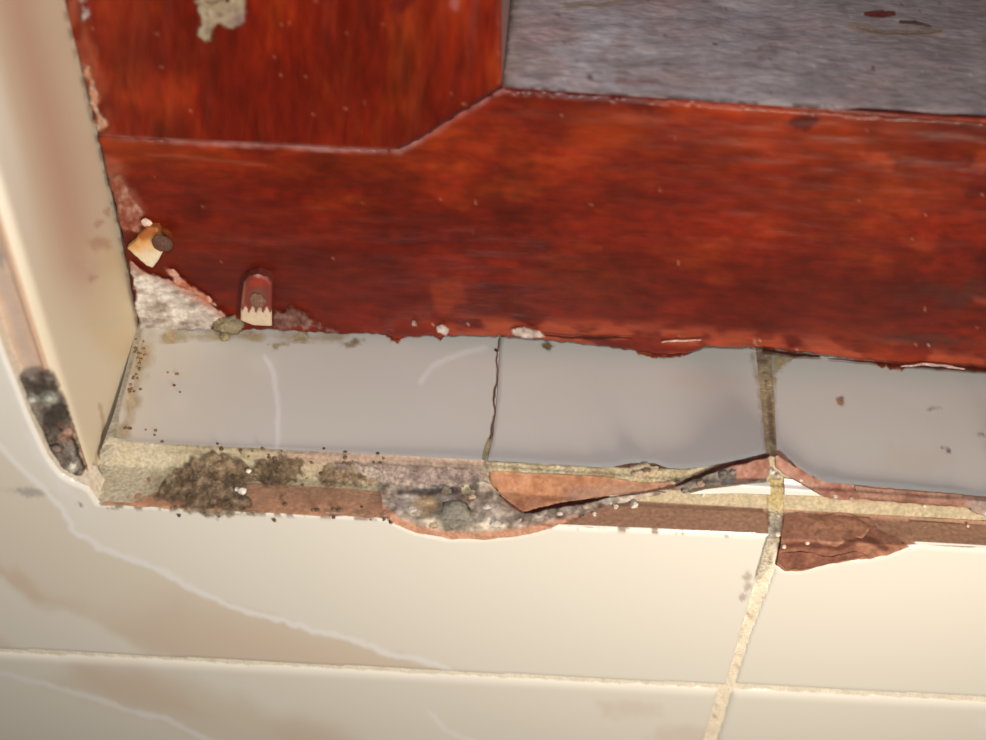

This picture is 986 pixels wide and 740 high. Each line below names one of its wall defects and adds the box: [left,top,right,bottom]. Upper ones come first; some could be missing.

peeling [113,176,143,233]
peeling [130,261,225,332]
crack [762,349,986,372]
crack [482,337,796,514]
spalling [336,455,986,540]
spalling [775,512,909,571]